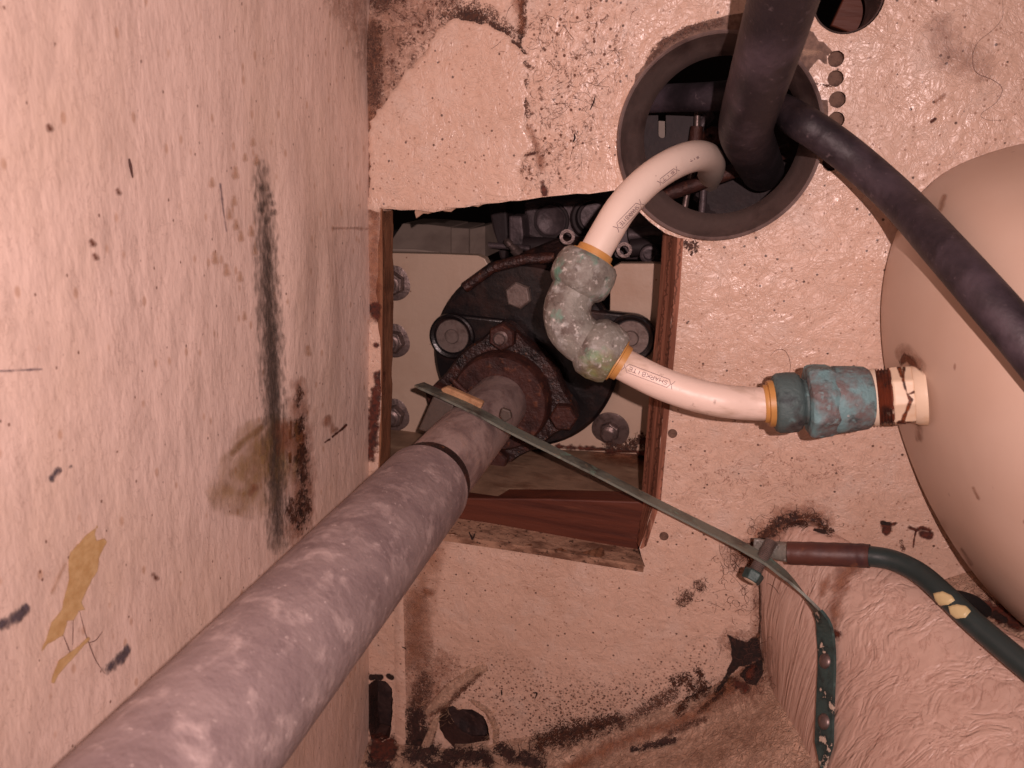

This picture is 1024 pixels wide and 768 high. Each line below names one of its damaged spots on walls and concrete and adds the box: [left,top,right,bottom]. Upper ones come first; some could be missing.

peeling [415,208,456,218]
damp [239,243,290,530]
damp [368,672,436,762]
damp [513,659,736,768]